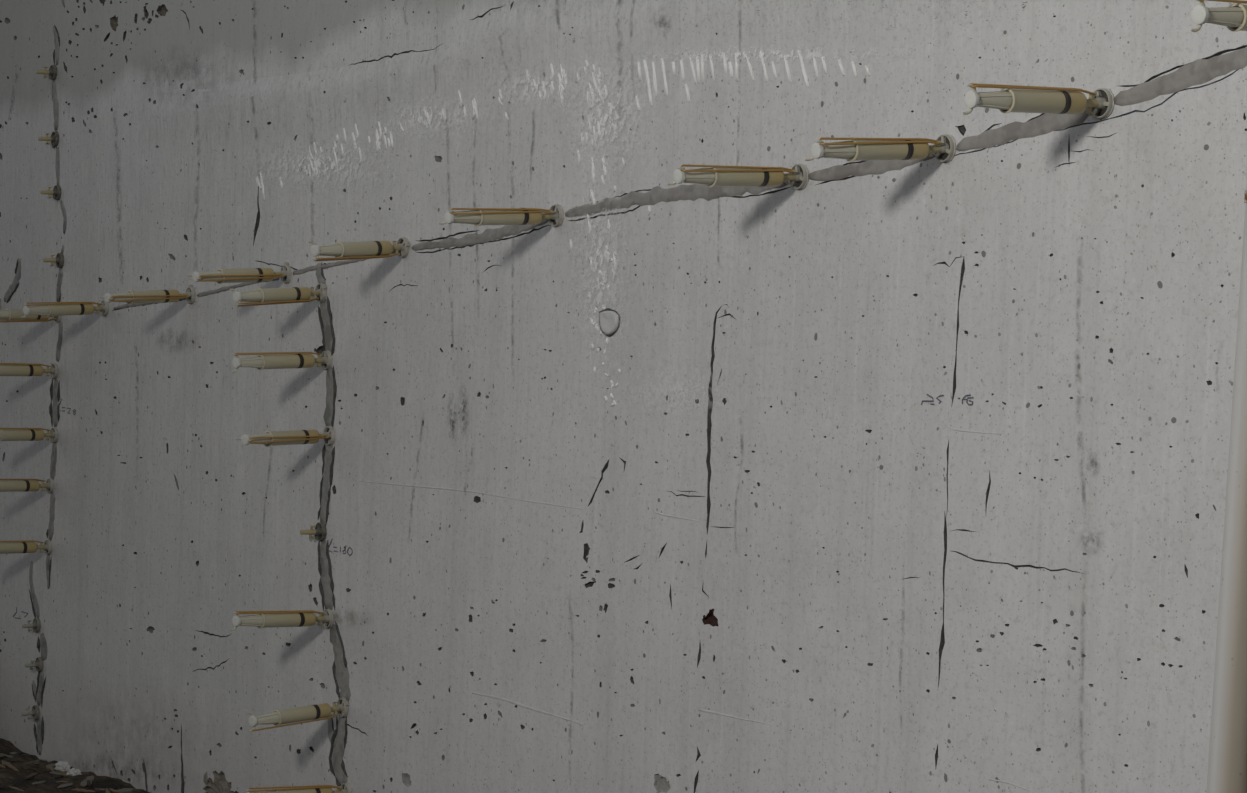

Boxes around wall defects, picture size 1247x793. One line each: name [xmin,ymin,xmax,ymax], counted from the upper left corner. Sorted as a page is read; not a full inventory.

crack [29,0,67,755]
crack [112,172,368,793]
leakage [256,90,478,201]
crack [350,44,442,65]
crack [579,457,626,533]
crack [624,543,672,608]
leakage [498,49,870,406]
crack [669,304,735,597]
crack [391,45,1247,271]
crack [933,256,966,407]
crack [904,441,1083,687]
crack [693,747,701,793]